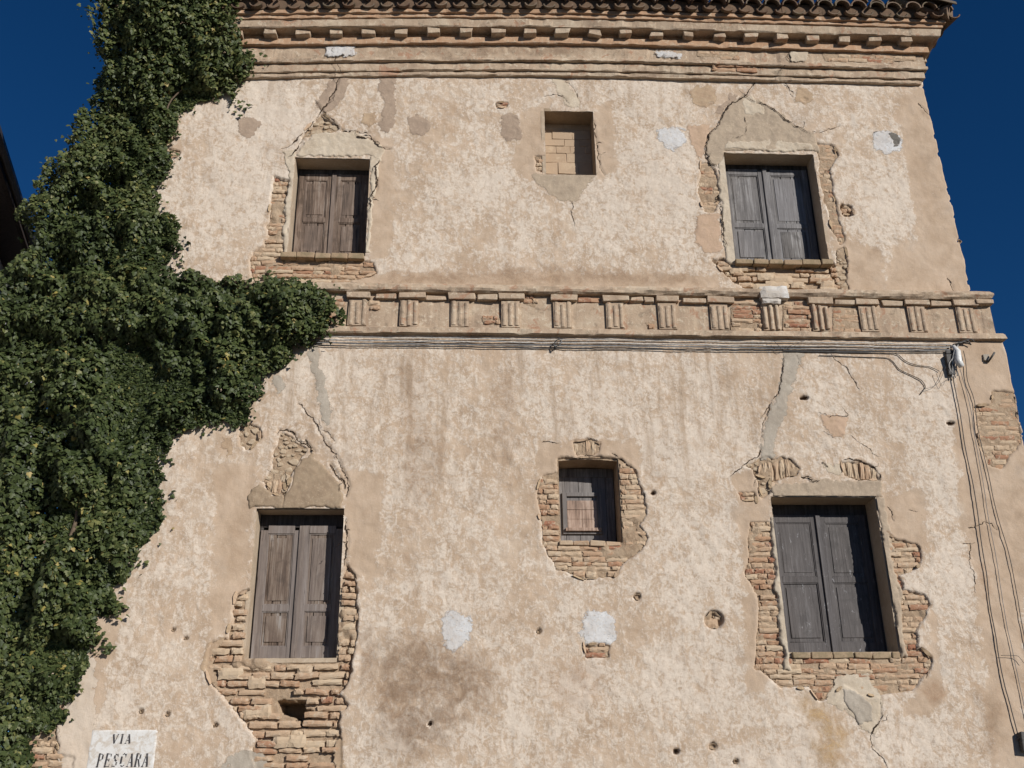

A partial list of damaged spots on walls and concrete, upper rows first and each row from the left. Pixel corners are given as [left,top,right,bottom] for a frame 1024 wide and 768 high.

spalling [250,178,376,282]
crack [281,46,385,211]
crack [705,51,838,244]
spalling [714,144,855,332]
crack [278,403,357,579]
spalling [536,460,655,581]
spalling [739,457,799,503]
crack [731,357,881,482]
spalling [973,391,1021,469]
spalling [205,569,358,768]
spalling [745,522,933,701]
crack [870,705,887,765]